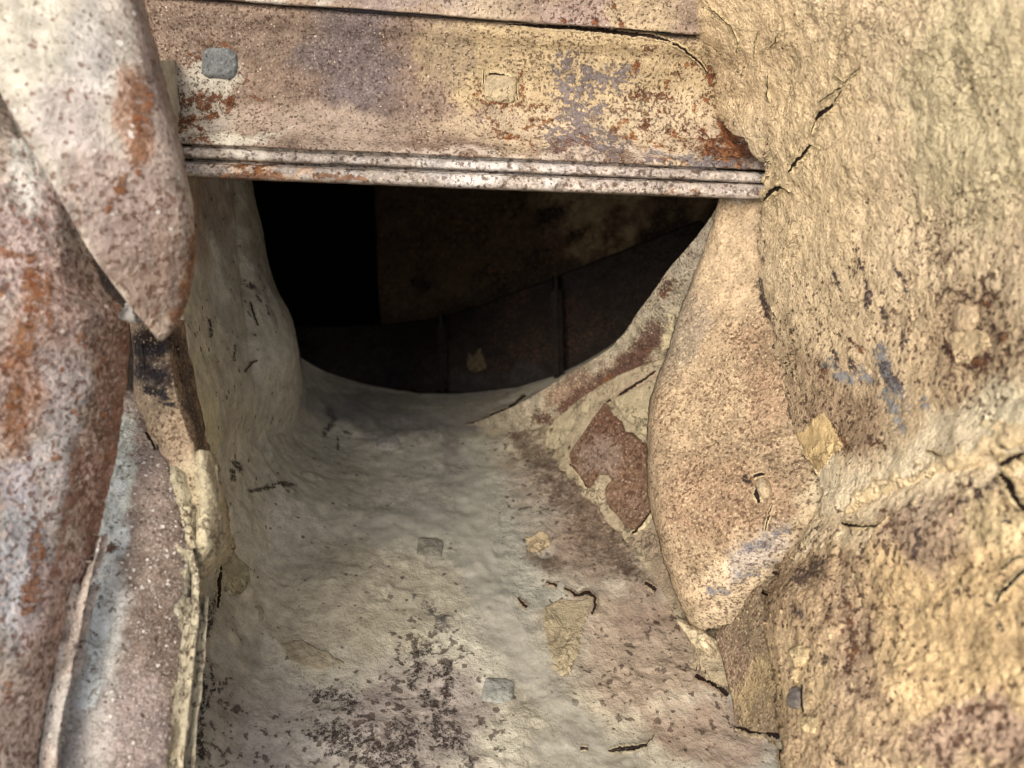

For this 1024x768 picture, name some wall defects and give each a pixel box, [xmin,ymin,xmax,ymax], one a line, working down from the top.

crack [508,22,708,73]
corrosion [178,88,238,146]
corrosion [473,71,595,153]
corrosion [625,45,683,142]
corrosion [681,117,755,163]
crack [761,66,861,202]
peeling [611,380,655,436]
peeling [796,413,844,472]
crack [517,596,529,610]
crack [545,580,599,615]
peeling [543,598,592,677]
leakage [301,593,475,768]